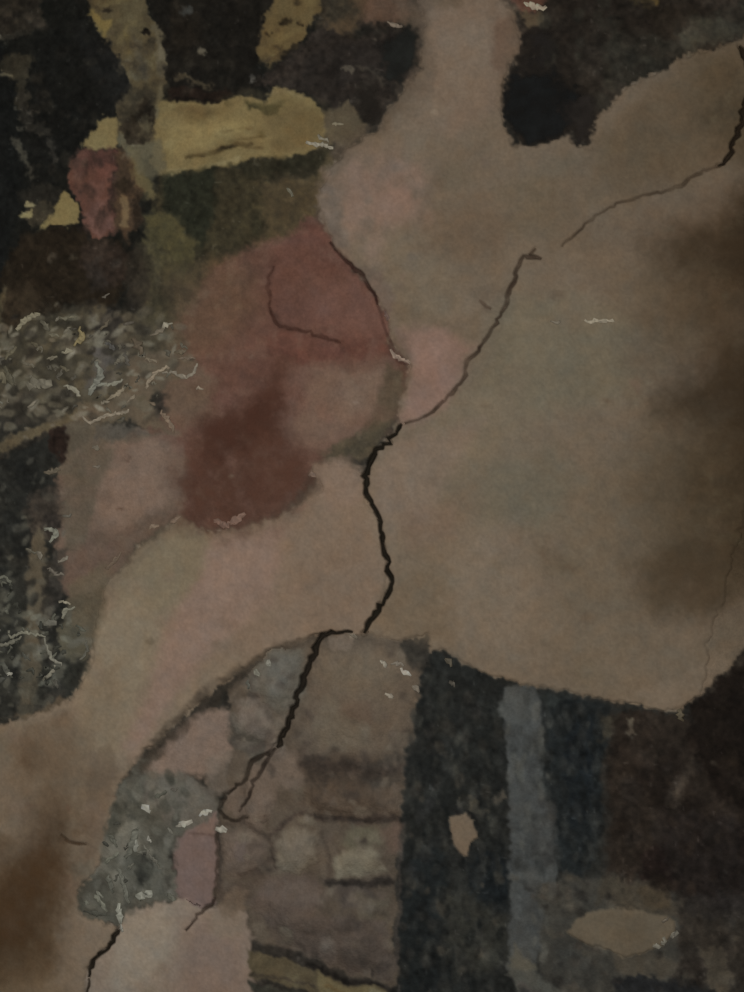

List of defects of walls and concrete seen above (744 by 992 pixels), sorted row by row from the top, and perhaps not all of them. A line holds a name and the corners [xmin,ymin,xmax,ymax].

crack [697,101,744,175]
crack [217,242,541,835]
crack [185,897,216,930]
crack [86,929,120,992]